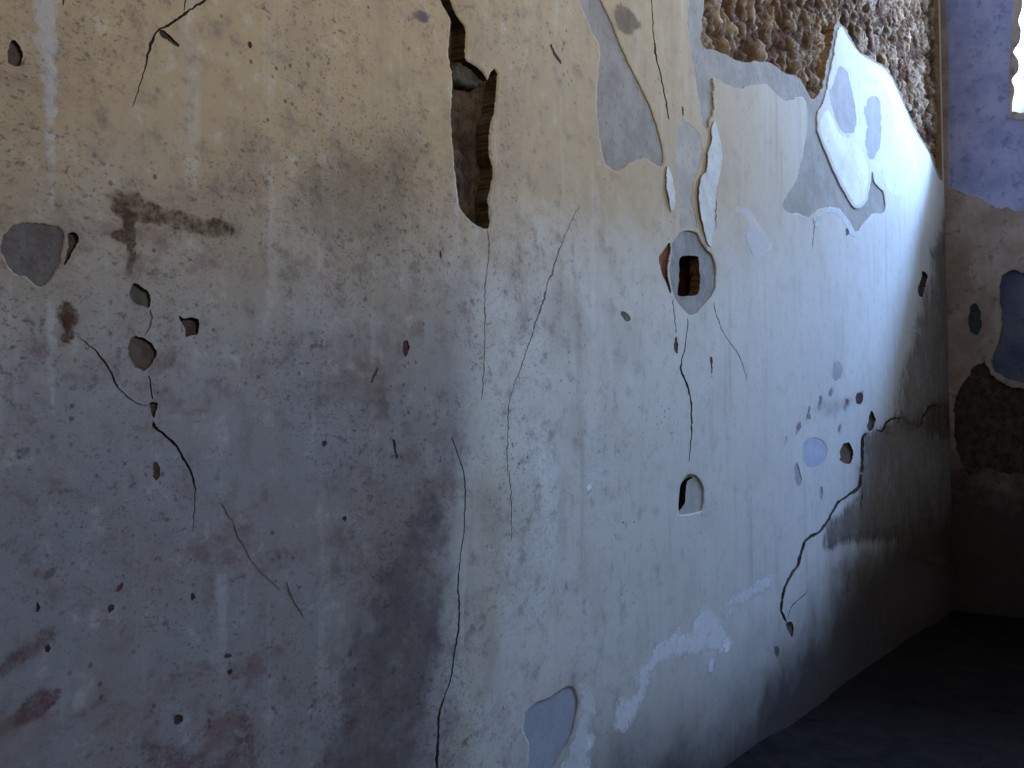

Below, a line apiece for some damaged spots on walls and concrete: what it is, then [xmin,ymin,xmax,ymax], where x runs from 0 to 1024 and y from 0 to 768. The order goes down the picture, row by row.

crack [132,0,206,107]
spalling [439,0,500,231]
spalling [579,0,676,212]
flaking render [659,0,1024,316]
crack [77,336,196,526]
crack [435,438,466,768]
spalling [522,686,579,768]
crack [672,298,693,461]
leakage [614,576,773,732]
crack [780,411,926,622]
leakage [824,221,953,560]
spalling [951,268,1024,477]